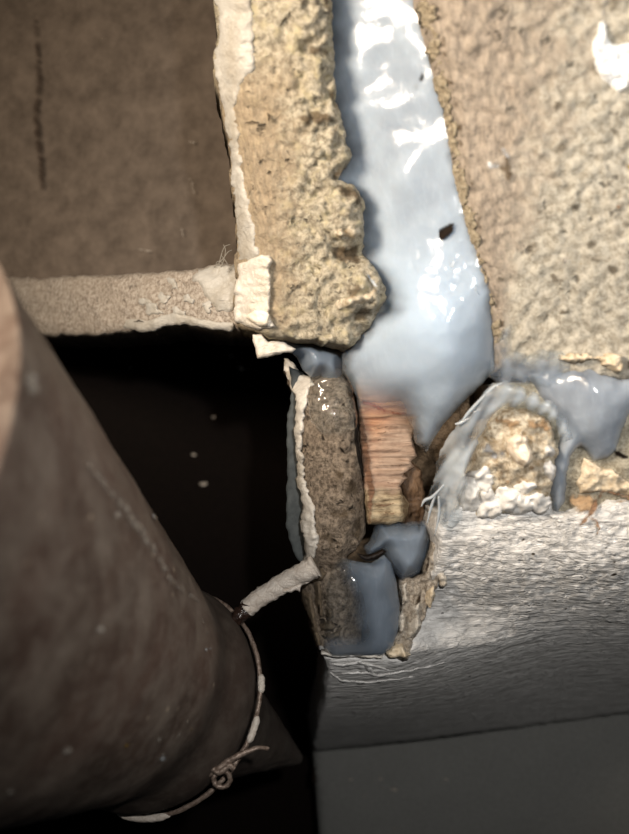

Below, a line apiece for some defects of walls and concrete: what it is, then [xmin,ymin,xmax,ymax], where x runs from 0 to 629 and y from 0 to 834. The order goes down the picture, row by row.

spalling [301,568,342,646]
peeling [386,540,447,661]